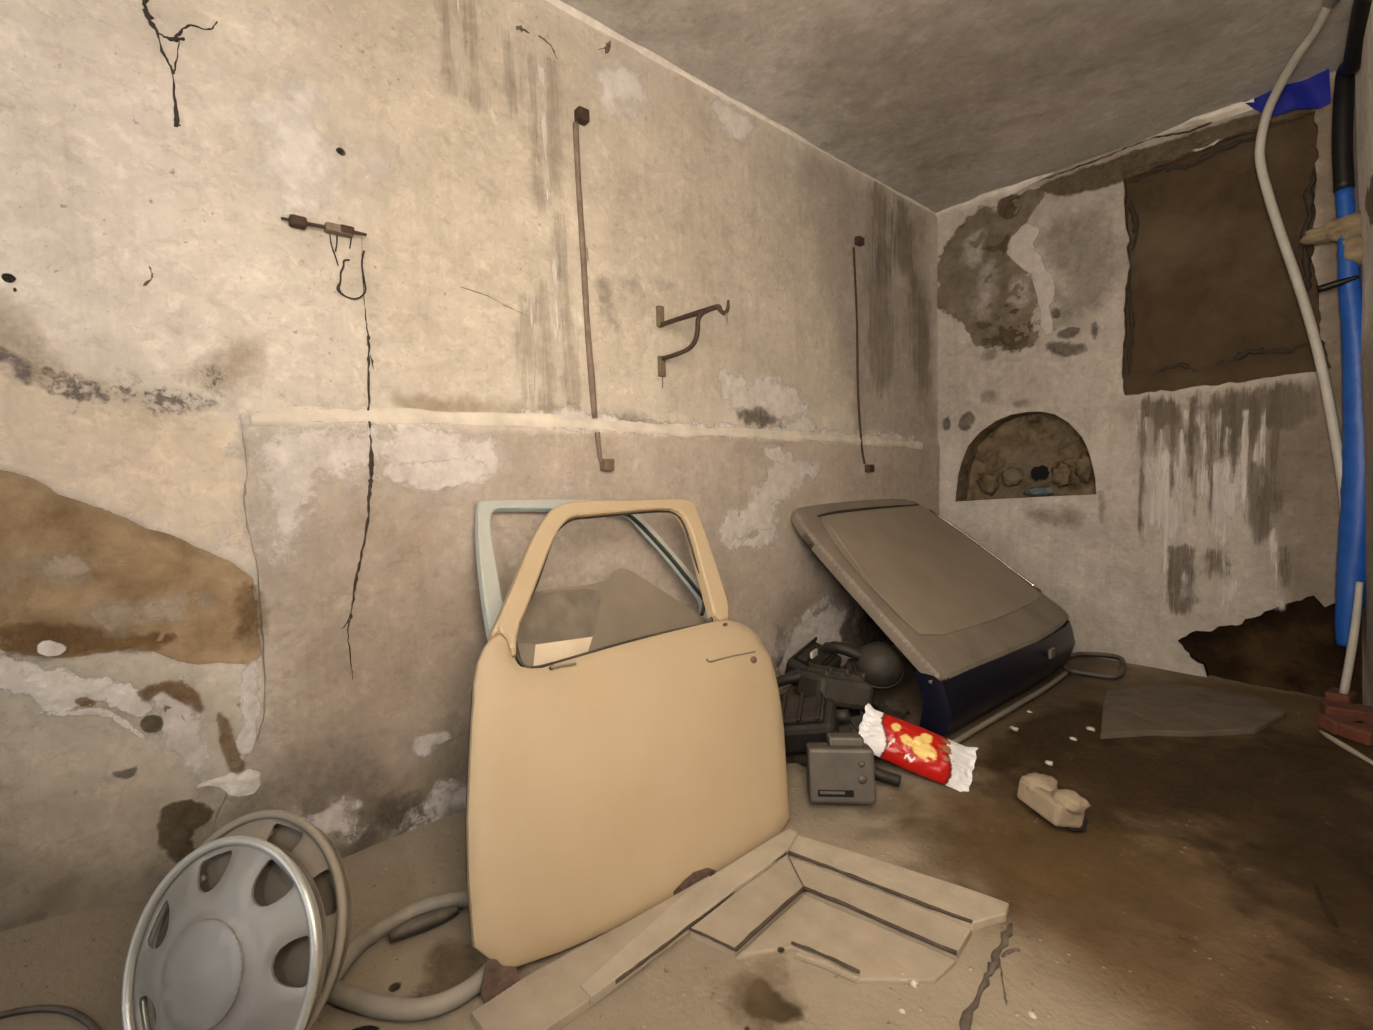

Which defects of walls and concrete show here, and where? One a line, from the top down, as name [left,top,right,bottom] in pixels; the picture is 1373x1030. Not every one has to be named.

spalling [937,189,1055,352]
crack [342,275,374,678]
water stain [1131,381,1309,616]
spalling [0,470,263,665]
spalling [75,697,95,707]
spalling [114,767,137,778]
spalling [139,681,244,773]
spalling [1178,638,1209,676]
crack [959,923,1020,1030]